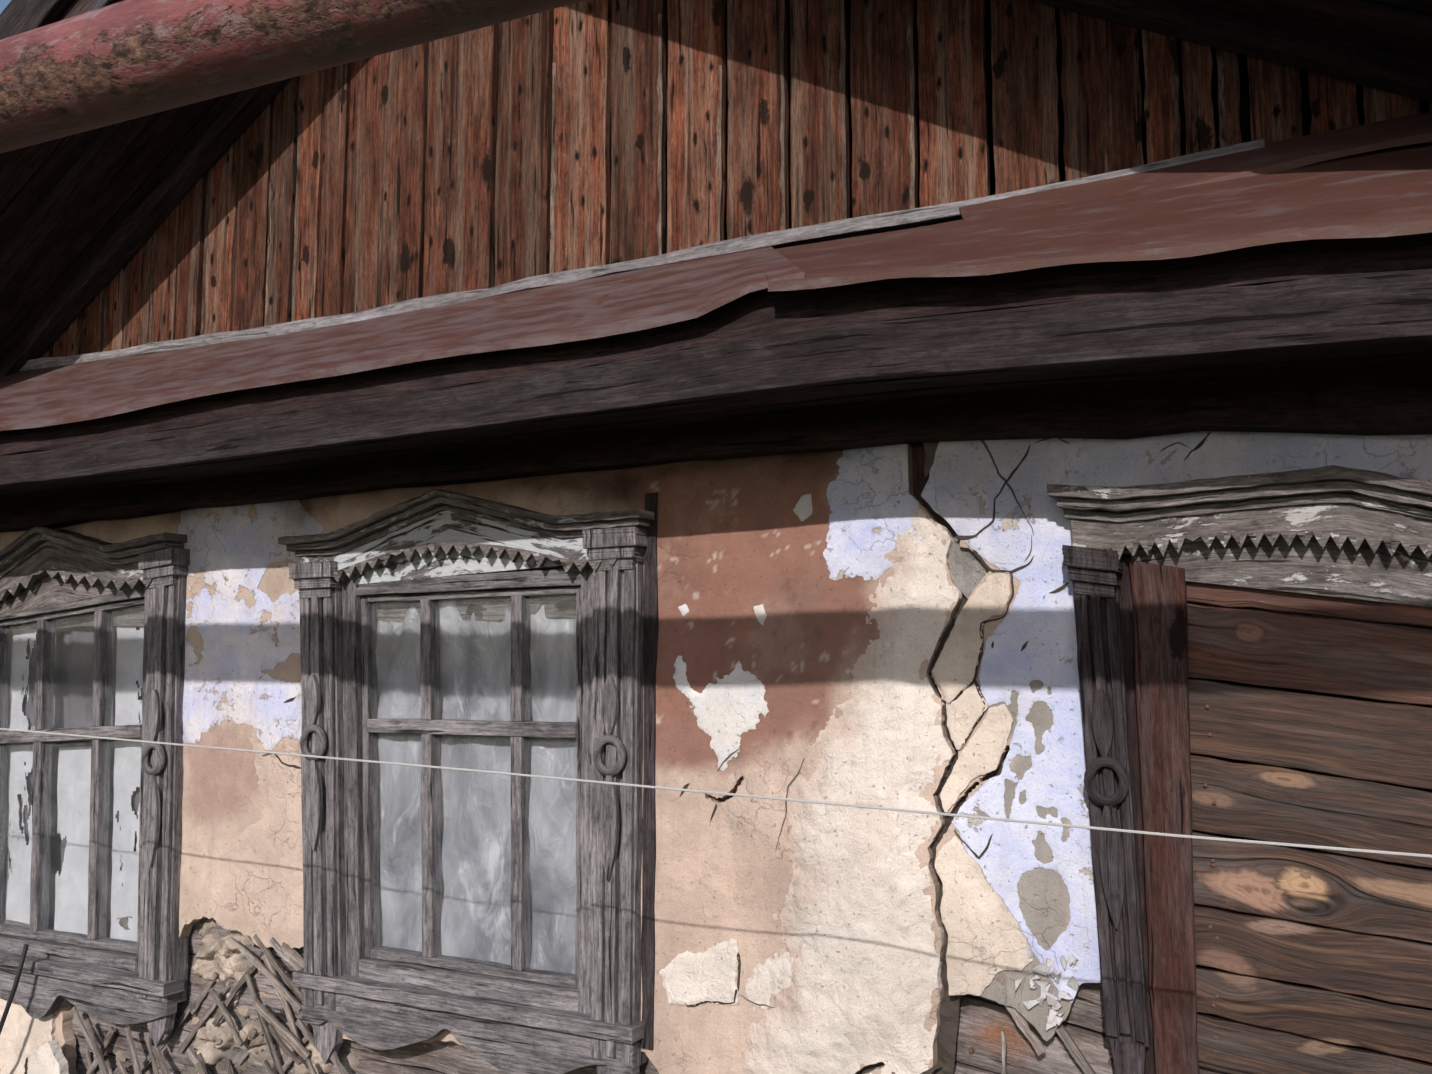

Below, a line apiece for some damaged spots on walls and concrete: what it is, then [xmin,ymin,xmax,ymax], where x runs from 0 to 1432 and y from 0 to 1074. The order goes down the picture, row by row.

peeling [178,500,325,949]
peeling [673,656,795,859]
peeling [753,604,767,625]
crack [912,438,1070,1074]
peeling [793,431,1432,1003]
crack [855,1062,885,1074]